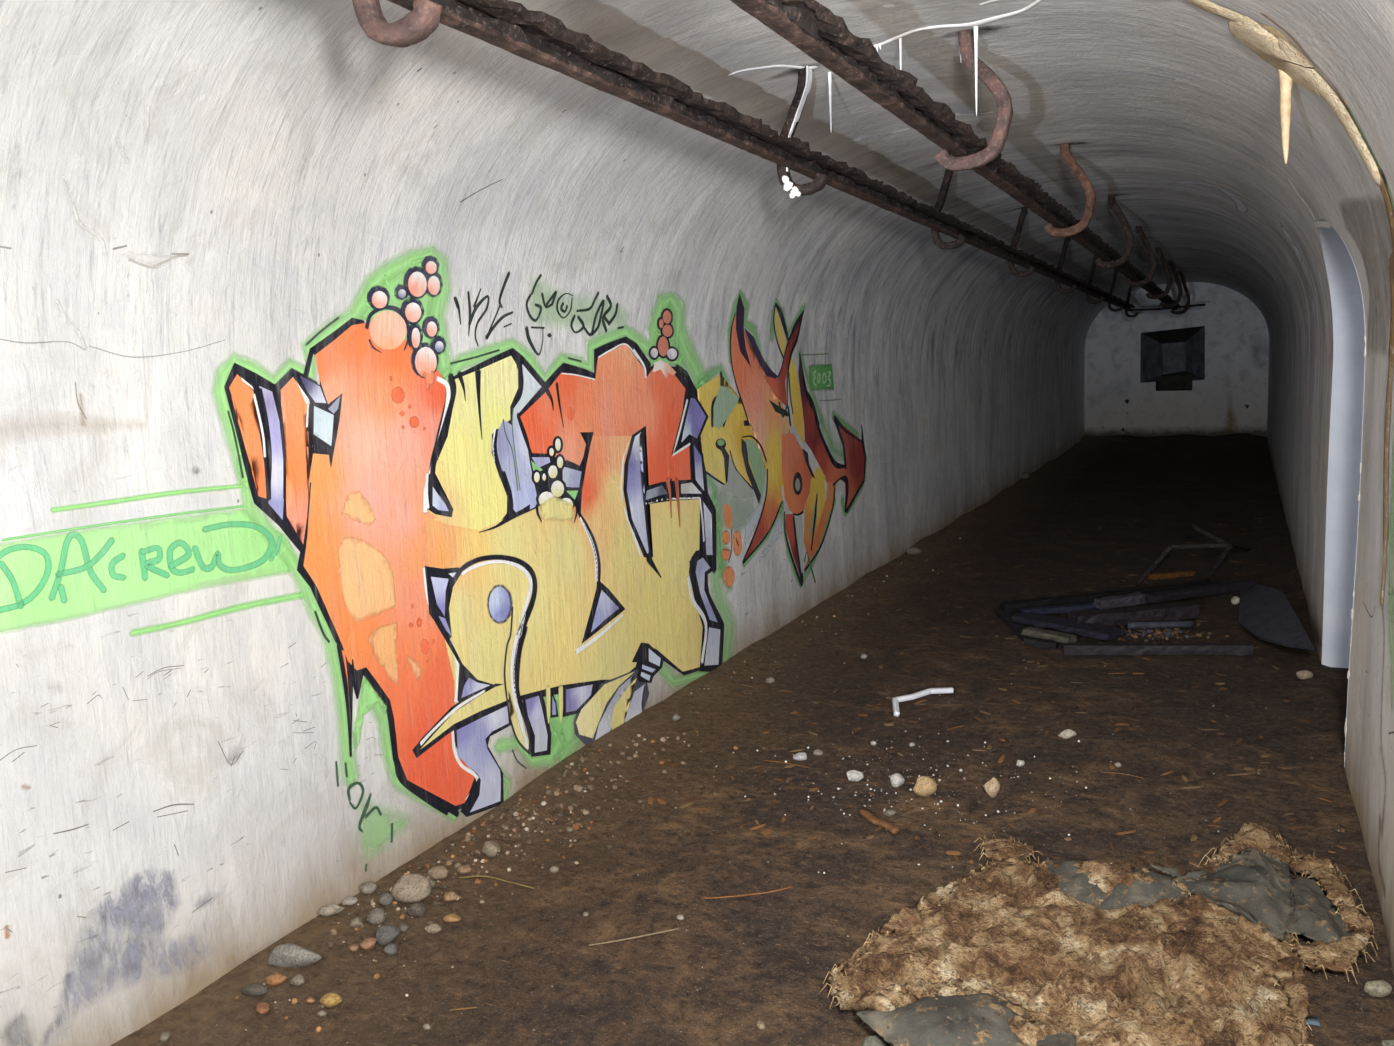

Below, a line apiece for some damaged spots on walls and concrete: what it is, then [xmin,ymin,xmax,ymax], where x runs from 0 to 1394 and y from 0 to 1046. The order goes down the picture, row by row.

crack [873,0,1042,48]
crack [728,65,818,76]
crack [1187,0,1394,623]